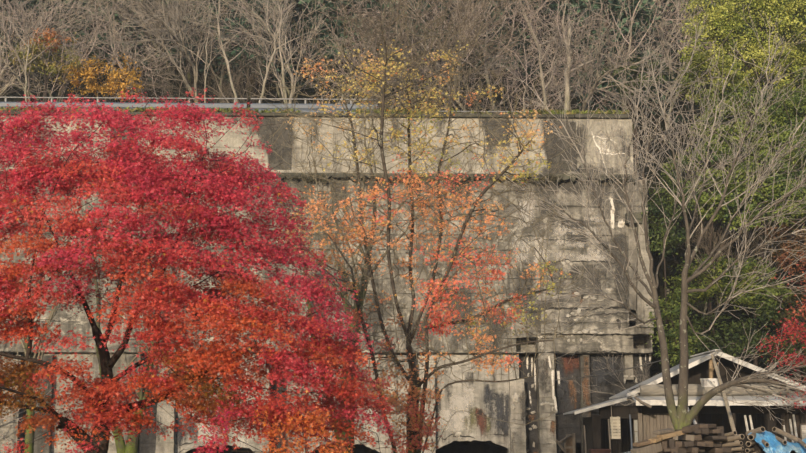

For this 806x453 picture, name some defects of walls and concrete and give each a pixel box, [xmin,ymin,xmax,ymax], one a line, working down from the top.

rust [475,409,486,433]
damp [465,384,513,449]
damp [520,355,570,423]